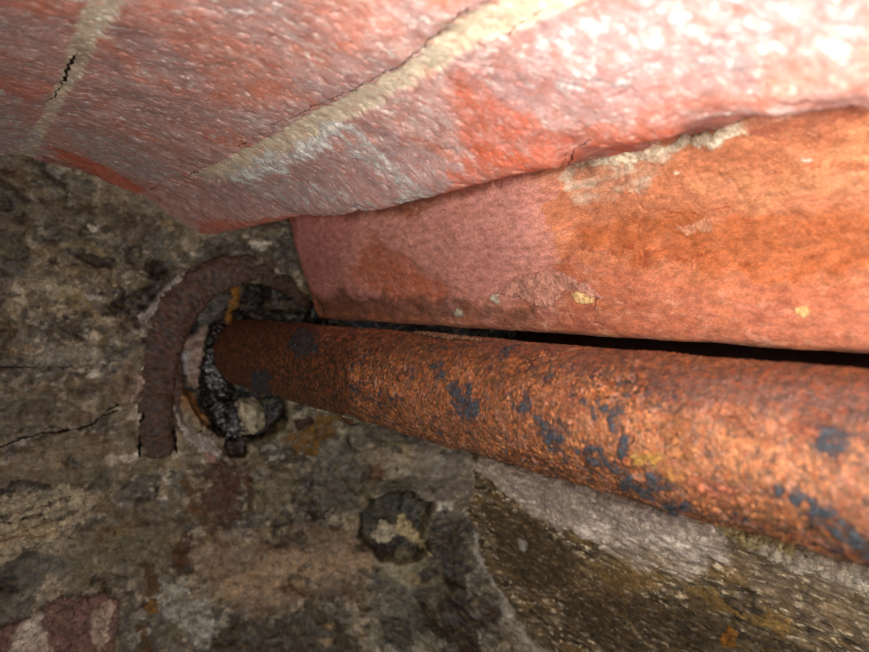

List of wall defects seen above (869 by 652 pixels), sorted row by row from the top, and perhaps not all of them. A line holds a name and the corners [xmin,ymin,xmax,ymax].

crack [50,53,78,100]
spalling [541,114,869,292]
peeling [498,269,604,308]
rust [413,331,482,340]
crack [0,404,145,457]
rust [283,414,341,457]
rust [180,451,254,535]